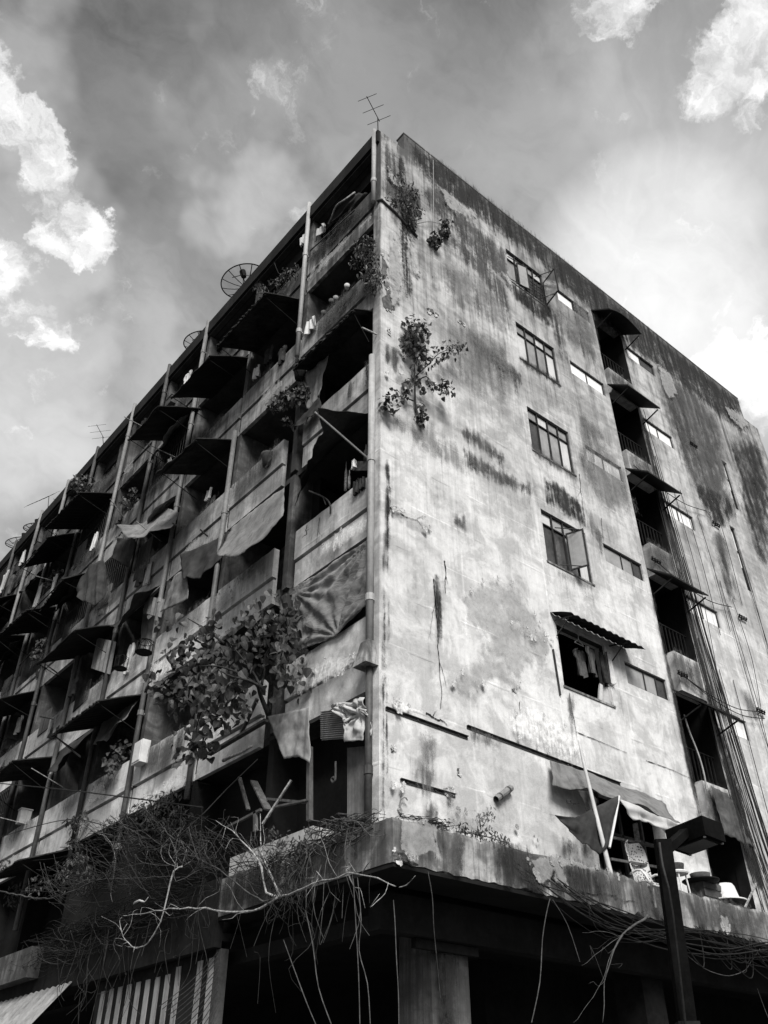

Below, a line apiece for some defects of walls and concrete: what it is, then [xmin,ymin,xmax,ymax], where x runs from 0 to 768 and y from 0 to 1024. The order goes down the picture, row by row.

damp [383,139,768,598]
damp [441,827,464,872]
damp [493,838,663,916]
damp [649,490,764,888]